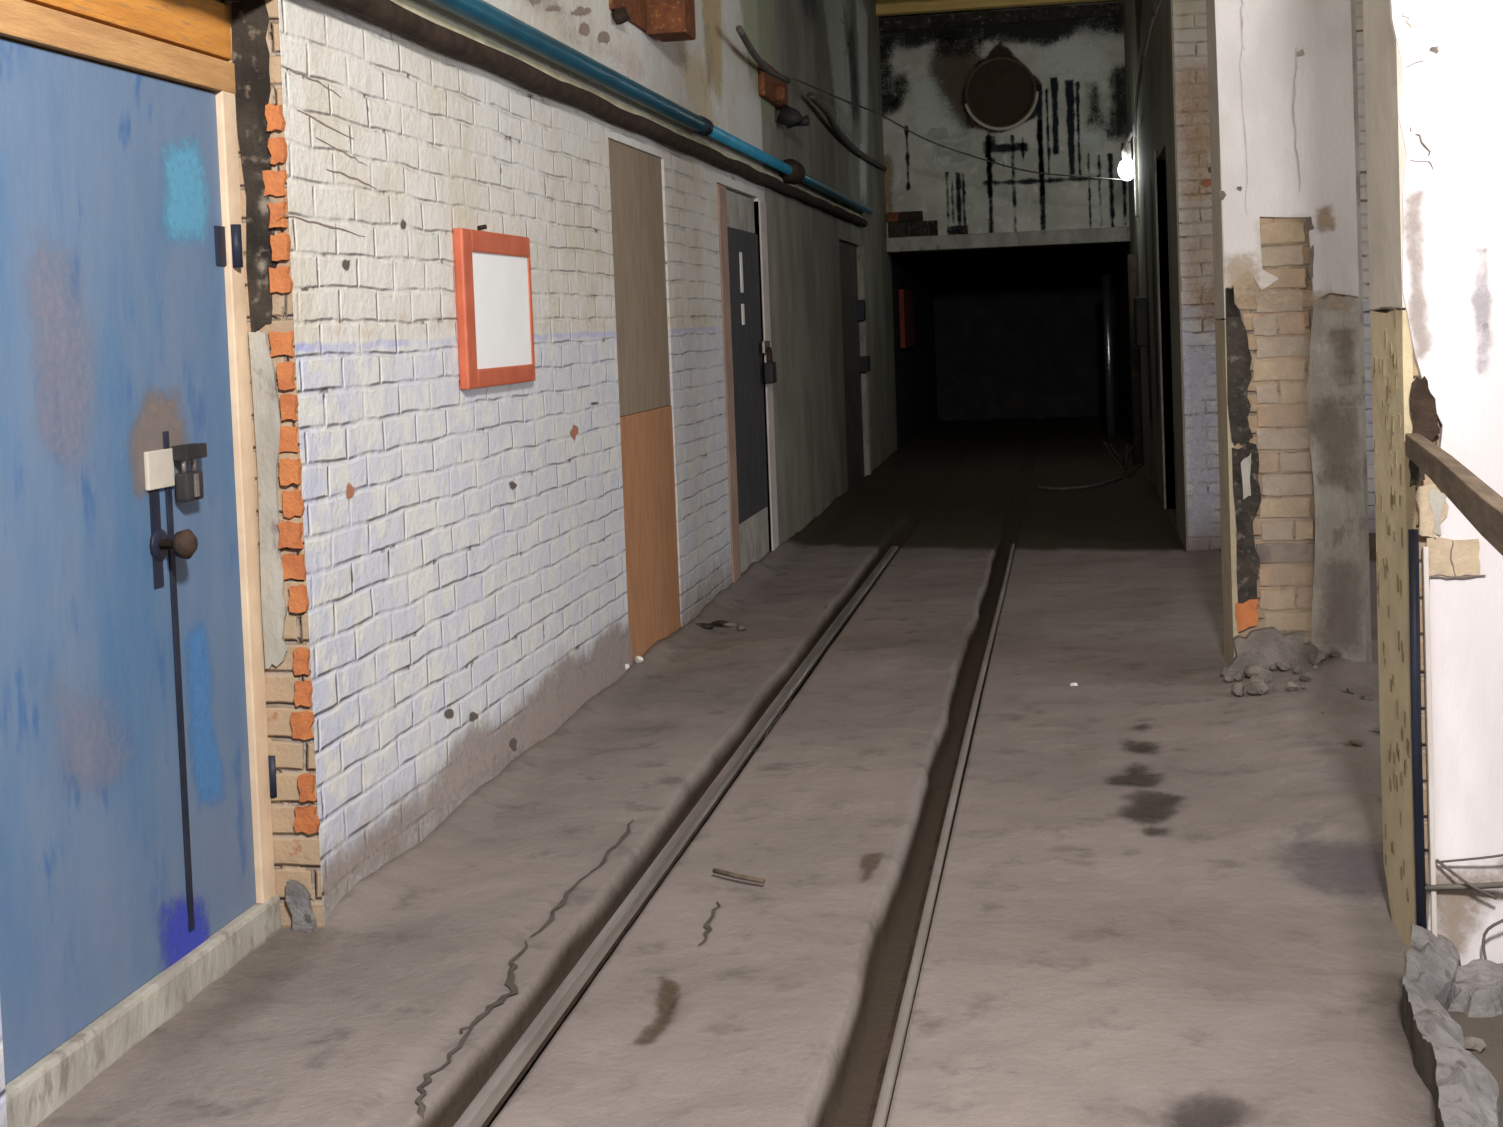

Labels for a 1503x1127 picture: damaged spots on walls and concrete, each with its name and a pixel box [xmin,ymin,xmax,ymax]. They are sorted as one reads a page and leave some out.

water stain [879,0,1142,116]
spalling [262,103,365,293]
water stain [945,172,968,235]
water stain [983,66,1159,421]
spalling [269,331,309,613]
flaking render [1225,207,1335,643]
spalling [1409,376,1440,441]
flaking render [1409,458,1486,579]
spalling [290,647,315,740]
spalling [294,773,320,834]
crack [415,819,634,1123]
water stain [1172,1097,1240,1127]